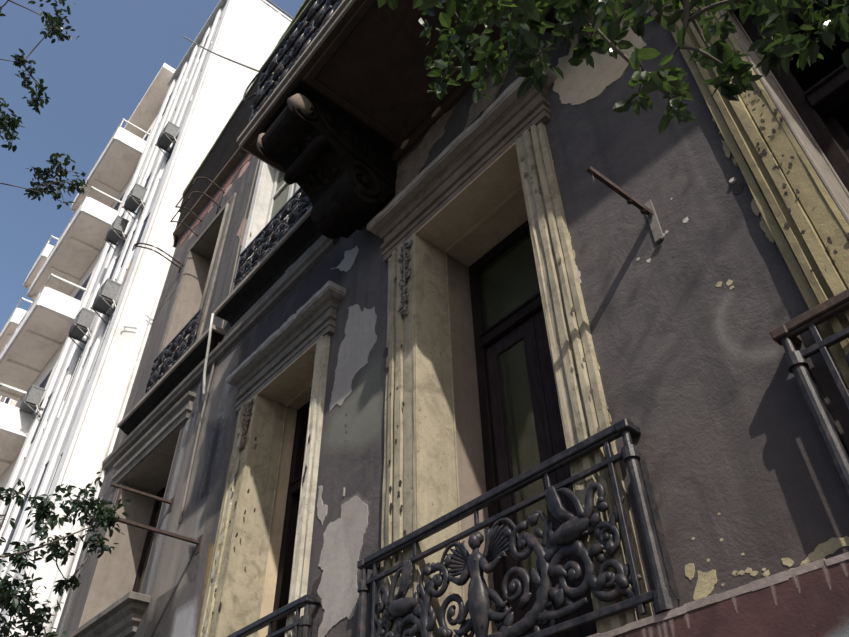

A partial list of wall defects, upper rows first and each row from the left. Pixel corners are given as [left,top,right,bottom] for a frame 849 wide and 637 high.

peeling [553,8,647,106]
peeling [331,246,359,272]
peeling [329,304,377,412]
peeling [311,485,369,637]
flaking render [685,558,725,600]
flaking render [732,567,770,577]
flaking render [781,536,849,570]